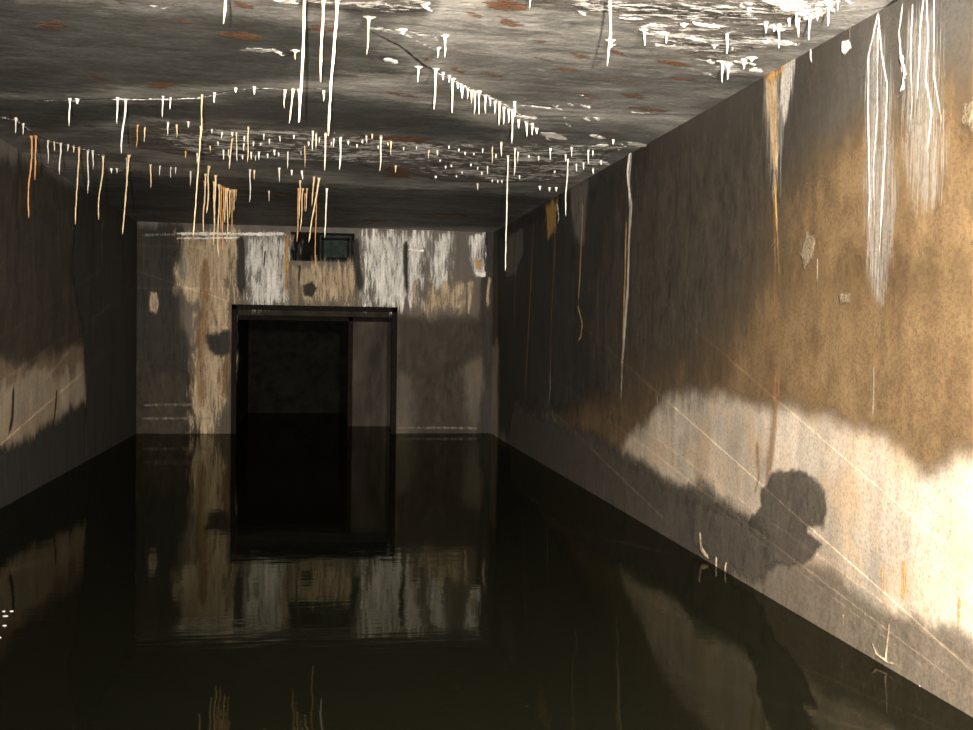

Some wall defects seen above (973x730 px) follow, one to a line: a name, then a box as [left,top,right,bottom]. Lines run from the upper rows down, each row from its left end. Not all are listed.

leakage [369,27,436,40]
leakage [0,97,499,135]
leakage [92,175,546,293]
leakage [509,0,973,717]